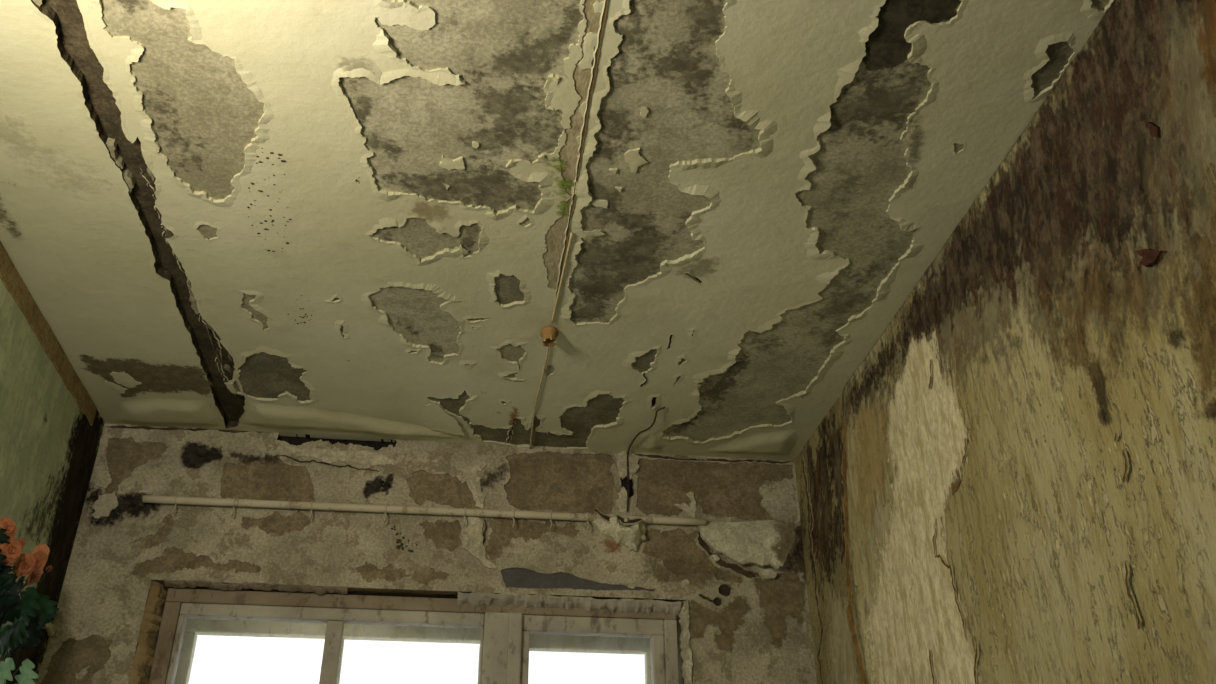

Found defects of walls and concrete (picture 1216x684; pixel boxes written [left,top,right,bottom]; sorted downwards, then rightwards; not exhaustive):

peeling [89,0,274,207]
peeling [192,221,222,243]
crack [139,168,236,396]
peeling [237,289,273,331]
peeling [331,0,968,596]
damp [649,0,1216,651]
peeling [225,346,319,405]
peeling [92,434,173,519]
peeling [218,433,400,538]
peeling [130,512,263,579]
spalling [681,579,734,608]